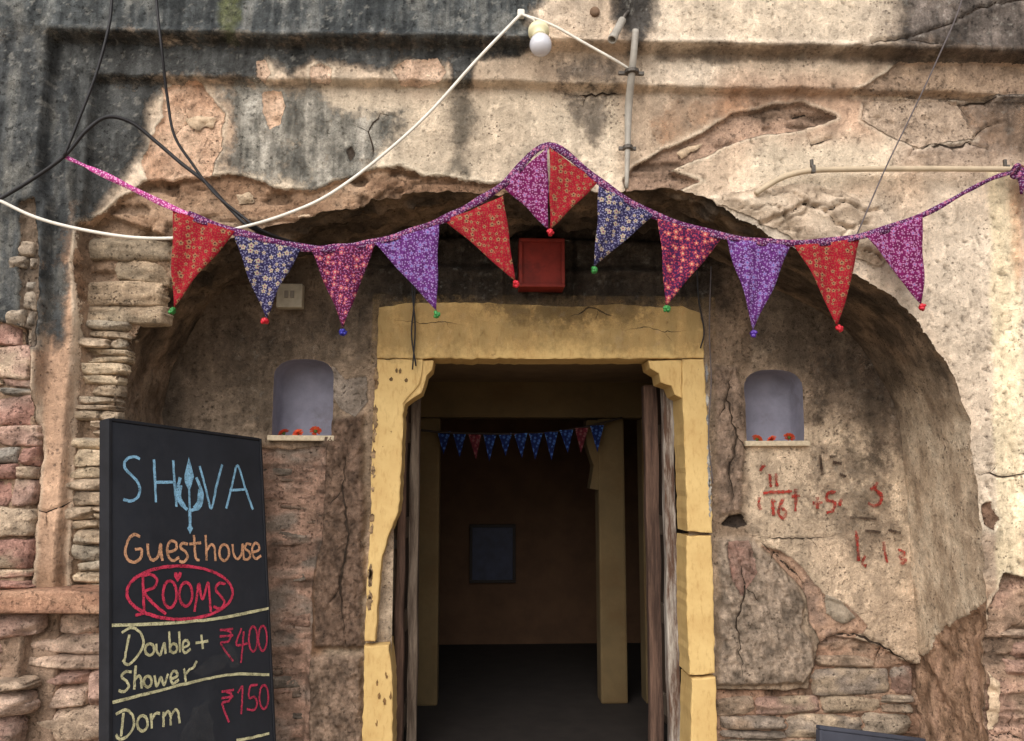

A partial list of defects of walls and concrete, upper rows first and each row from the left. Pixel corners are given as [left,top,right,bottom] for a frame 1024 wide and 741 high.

crack [859,0,1022,48]
leakage [0,0,545,344]
leakage [559,58,616,143]
spalling [623,102,836,192]
crack [913,94,1002,150]
spalling [64,79,507,585]
crack [719,365,747,504]
crack [330,445,350,643]
spalling [707,440,1024,741]